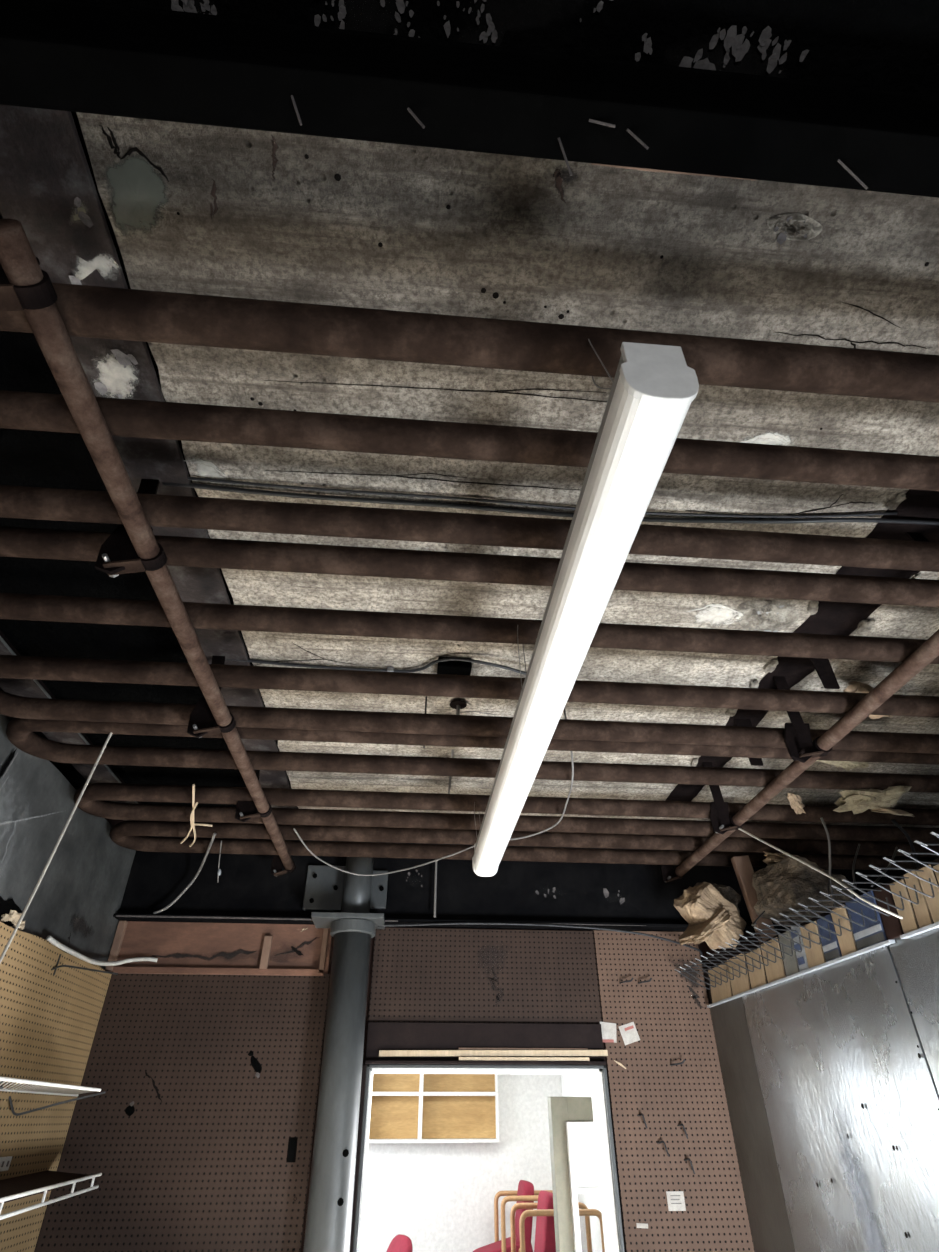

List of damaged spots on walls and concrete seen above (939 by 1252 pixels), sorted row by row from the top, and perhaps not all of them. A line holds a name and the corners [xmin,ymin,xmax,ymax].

peeling [171,0,217,15]
peeling [314,0,346,29]
peeling [380,0,420,38]
peeling [437,0,498,43]
peeling [635,33,653,62]
peeling [679,25,809,74]
crack [99,125,169,182]
peeling [69,254,118,285]
peeling [94,349,138,399]